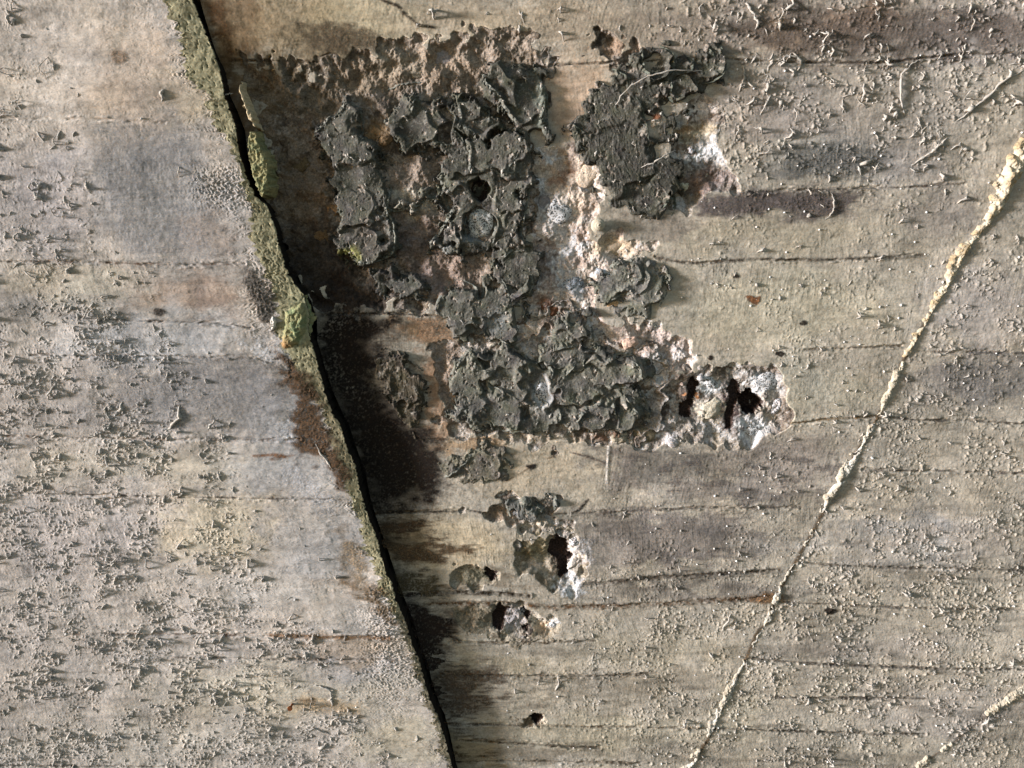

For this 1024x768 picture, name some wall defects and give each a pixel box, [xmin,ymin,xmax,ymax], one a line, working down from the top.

damp [238,300,511,757]
spalling [450,563,564,650]
spalling [240,21,795,470]
spalling [483,490,590,600]
crack [401,137,1024,768]
damp [697,190,861,217]